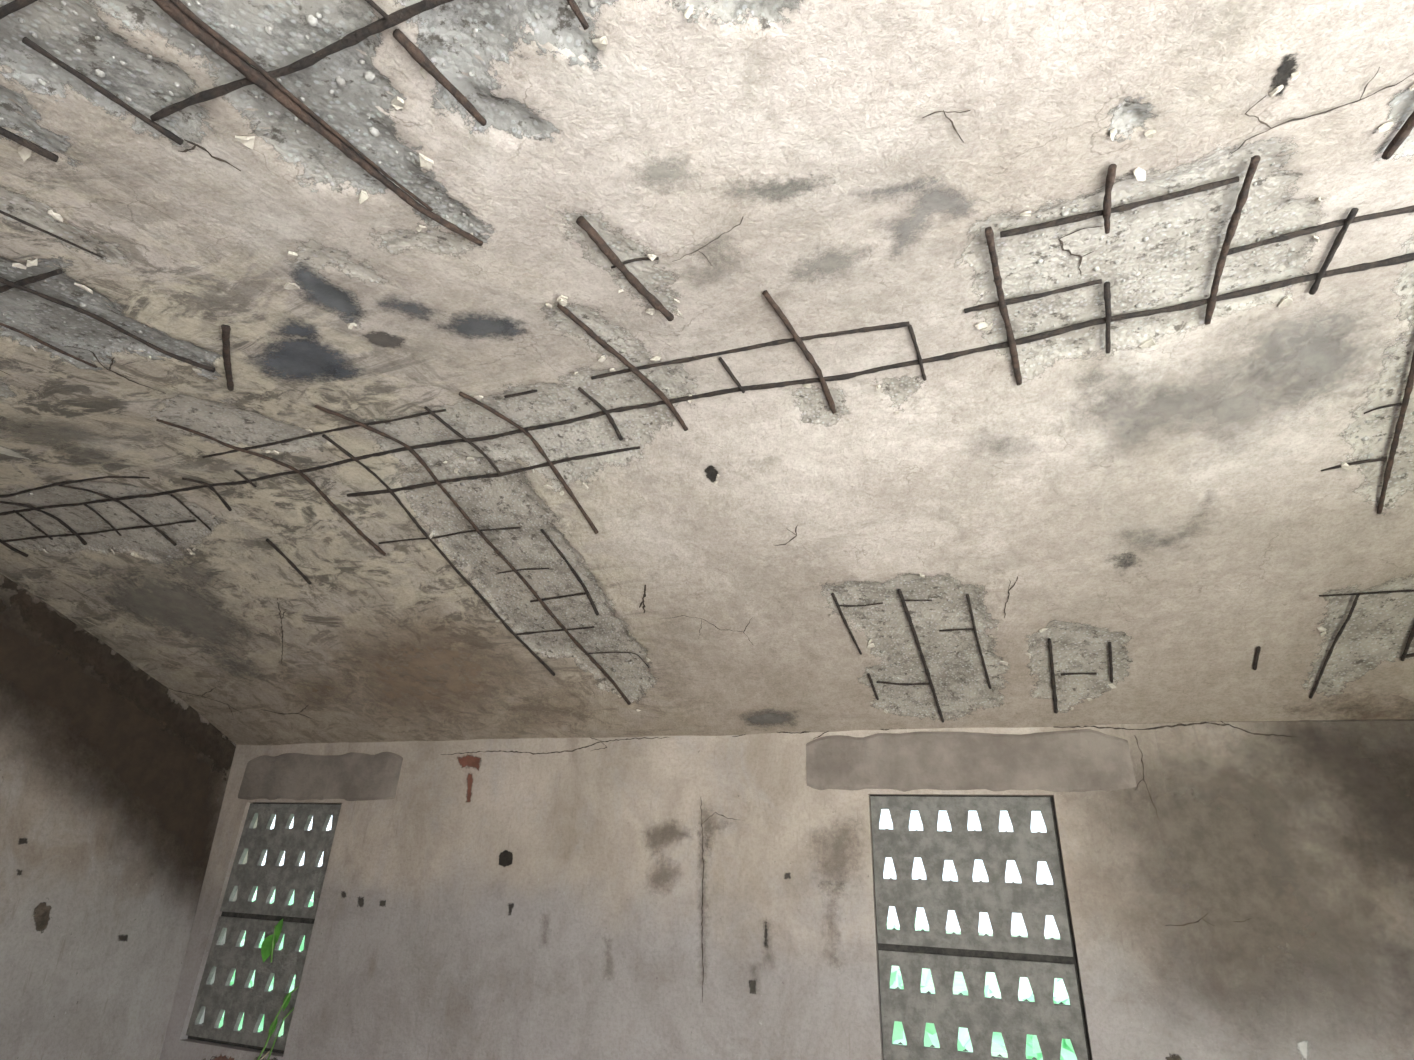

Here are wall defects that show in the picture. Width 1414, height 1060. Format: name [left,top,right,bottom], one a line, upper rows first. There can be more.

spalling [665,0,803,34]
spalling [1268,54,1300,97]
spalling [0,0,618,329]
spalling [1373,84,1414,161]
leakage [258,320,358,382]
leakage [292,262,405,348]
leakage [443,314,525,339]
spalling [0,137,1414,722]
leakage [0,576,230,893]
corrosion [457,755,481,802]
leakage [1278,703,1414,882]
leakage [1124,762,1377,1013]